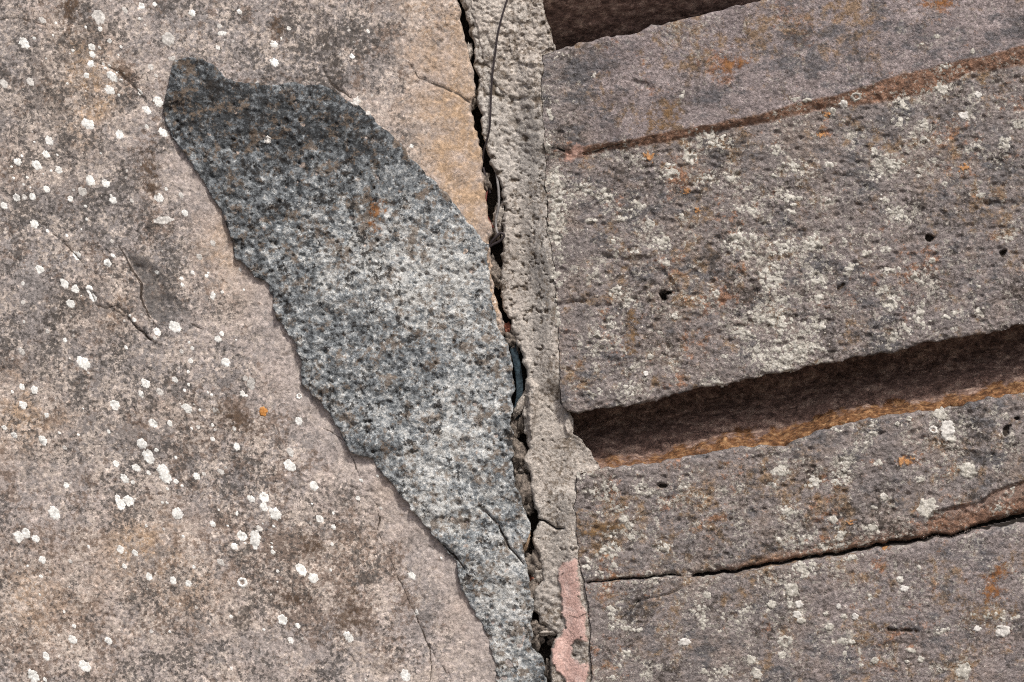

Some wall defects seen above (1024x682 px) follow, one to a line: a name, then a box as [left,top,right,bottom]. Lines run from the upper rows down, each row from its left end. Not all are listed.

crack [415,0,564,682]
crack [589,513,1024,619]